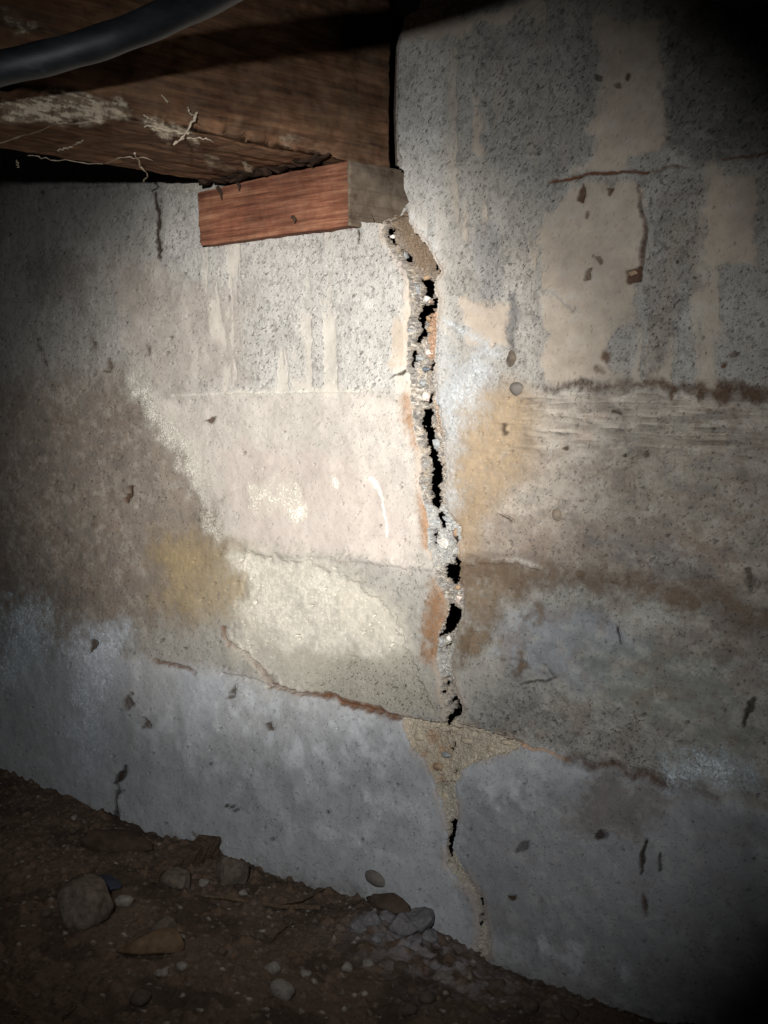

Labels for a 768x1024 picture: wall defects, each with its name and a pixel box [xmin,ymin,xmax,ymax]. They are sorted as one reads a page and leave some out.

crack [154,192,162,259]
efflorescence [127,361,222,540]
leakage [437,320,768,657]
crack [358,210,491,956]
crack [223,627,402,719]